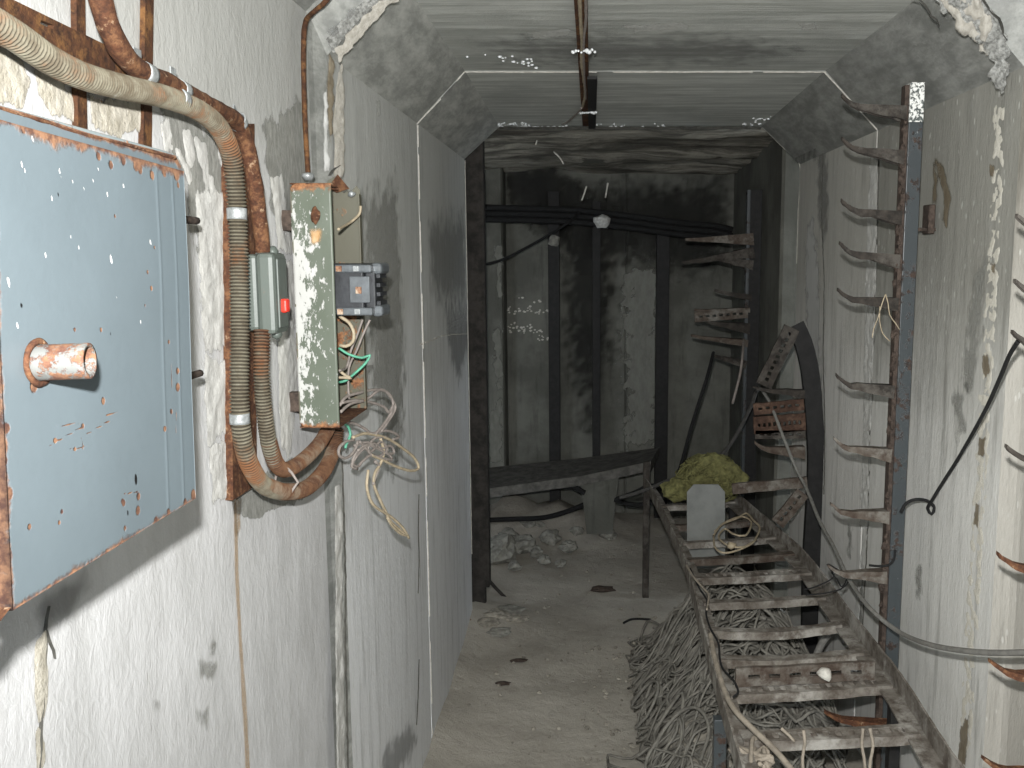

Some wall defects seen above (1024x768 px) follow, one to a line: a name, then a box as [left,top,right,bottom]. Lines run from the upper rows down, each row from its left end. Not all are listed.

peeling [0,47,74,122]
peeling [88,94,141,139]
spalling [324,0,399,178]
water stain [507,168,592,209]
peeling [160,95,308,519]
spalling [919,0,1011,578]
peeling [266,449,325,483]
spalling [958,719,968,765]